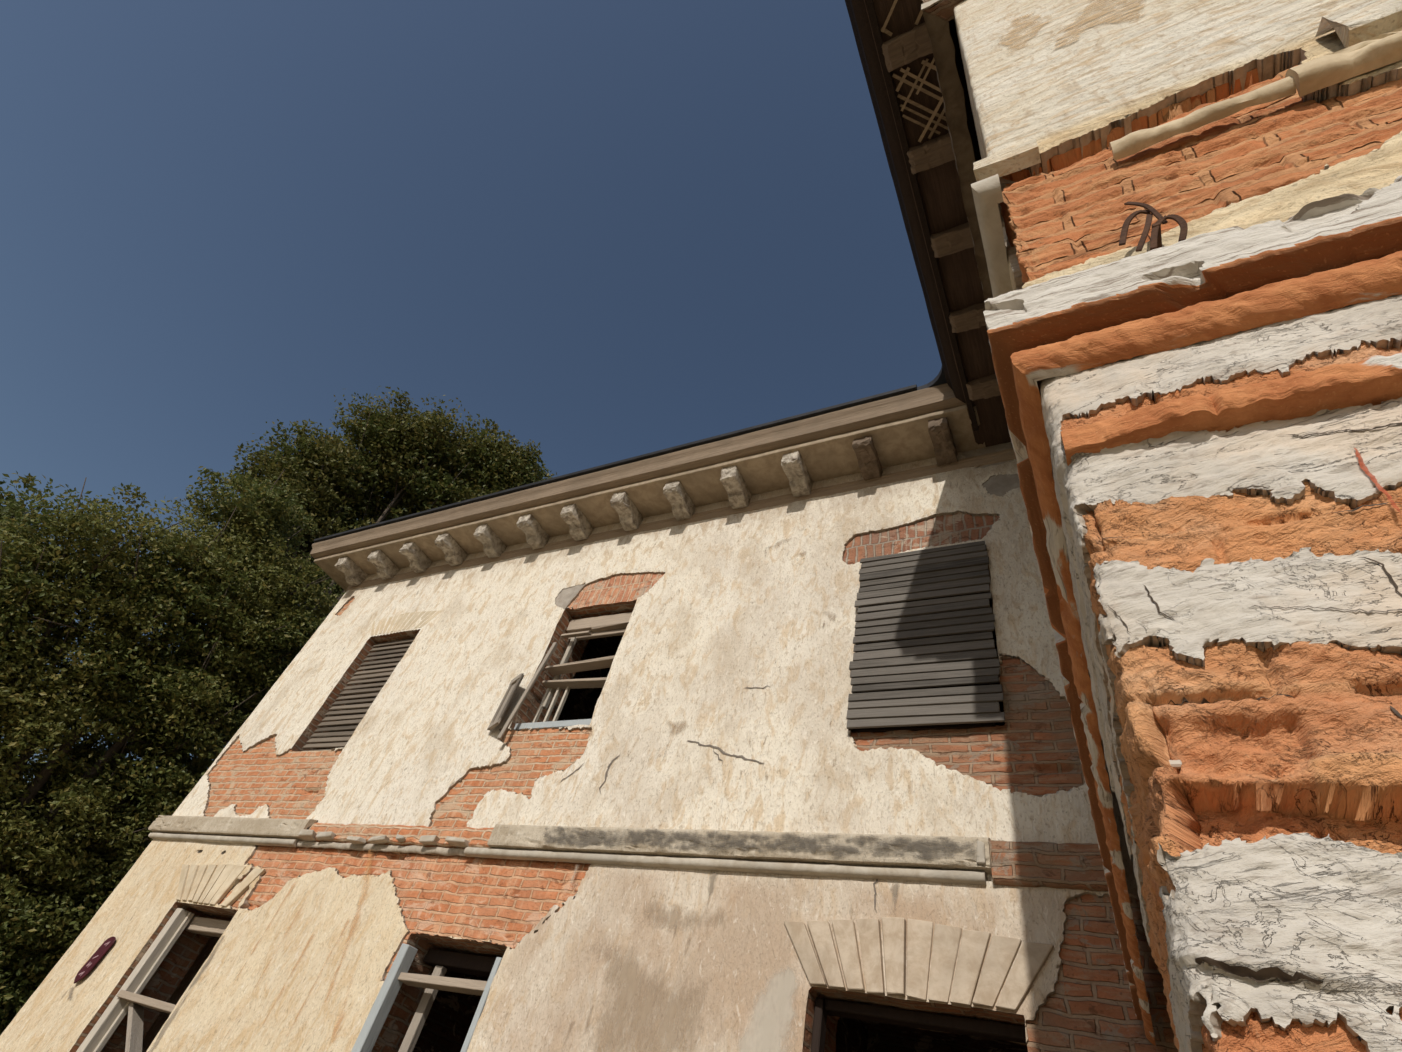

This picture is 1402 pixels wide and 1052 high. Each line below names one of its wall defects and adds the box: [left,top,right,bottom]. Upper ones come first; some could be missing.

spalling [998,46,1402,290]
spalling [1060,338,1402,431]
peeling [982,474,1020,496]
spalling [842,510,1000,565]
spalling [555,571,665,609]
crack [687,740,763,764]
spalling [849,653,1085,797]
spalling [1025,479,1402,1052]
spalling [203,727,592,981]